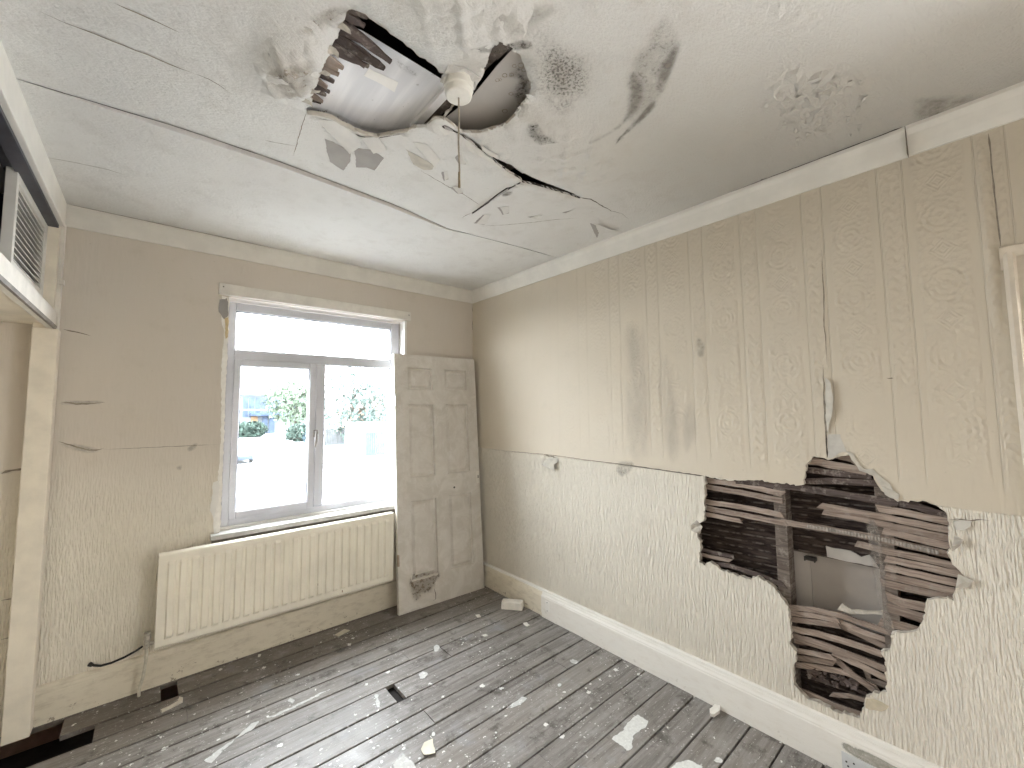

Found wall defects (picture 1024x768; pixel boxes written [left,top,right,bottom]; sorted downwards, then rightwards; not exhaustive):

crack [19,79,626,256]
water stain [661,51,675,80]
flaking render [758,61,869,142]
spalling [691,451,974,718]